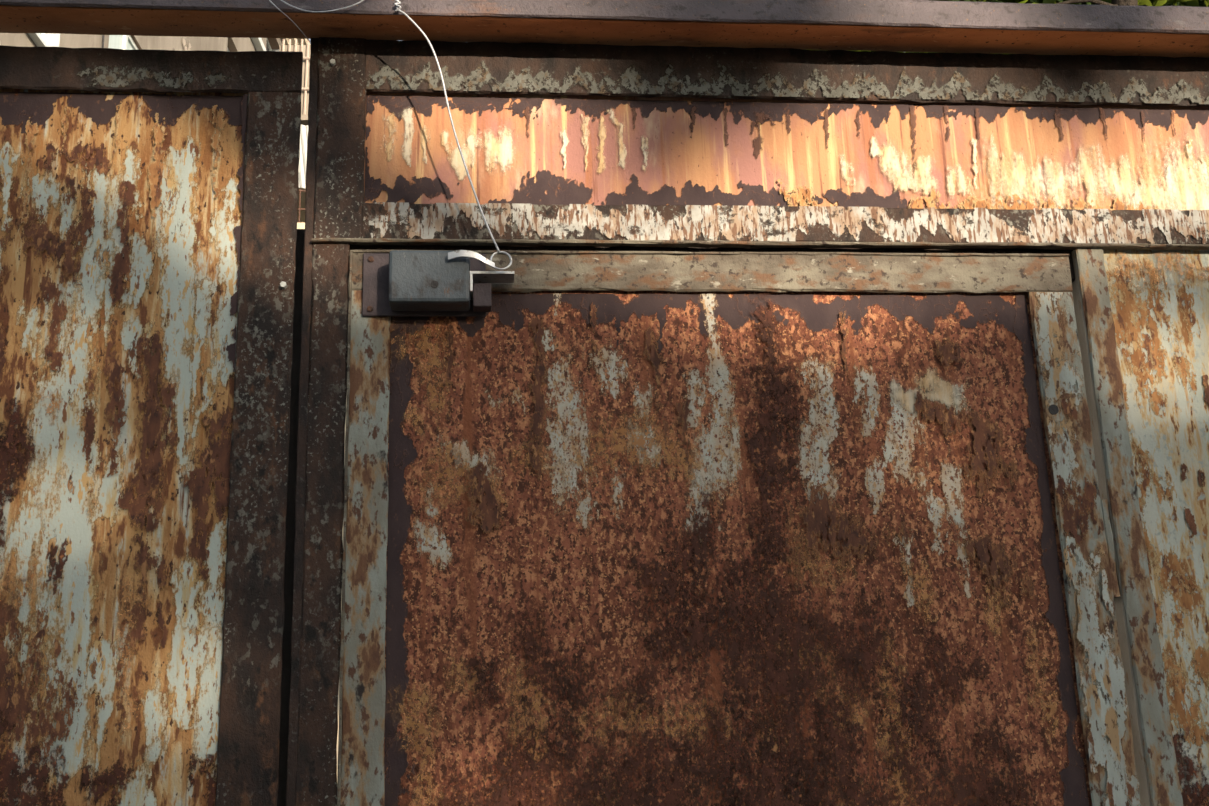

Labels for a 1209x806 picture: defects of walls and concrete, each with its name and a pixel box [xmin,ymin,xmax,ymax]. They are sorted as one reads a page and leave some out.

peeling [384,108,514,180]
peeling [363,137,1209,244]
rust [364,95,1209,210]
peeling [366,61,1209,104]
peeling [0,135,242,806]
rust [0,92,248,806]
peeling [537,293,663,529]
peeling [682,294,742,541]
rust [384,294,1101,806]
peeling [794,357,841,504]
peeling [852,365,974,607]
rust [1106,267,1209,806]